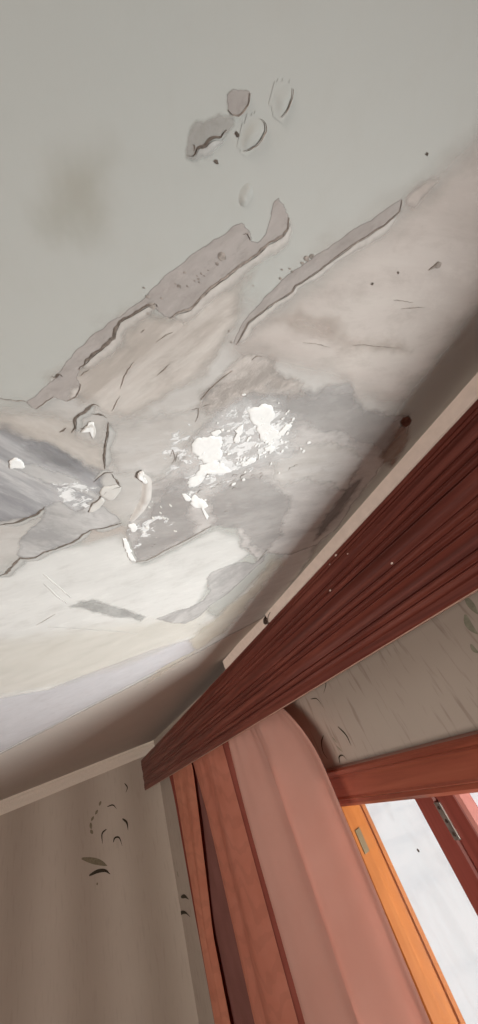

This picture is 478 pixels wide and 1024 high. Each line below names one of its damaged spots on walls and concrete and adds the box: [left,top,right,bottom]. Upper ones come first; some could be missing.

peeling [187,89,250,164]
peeling [0,142,478,625]
damp [0,430,102,521]
damp [317,480,361,537]
corrosion [382,416,412,465]
damp [0,563,278,752]